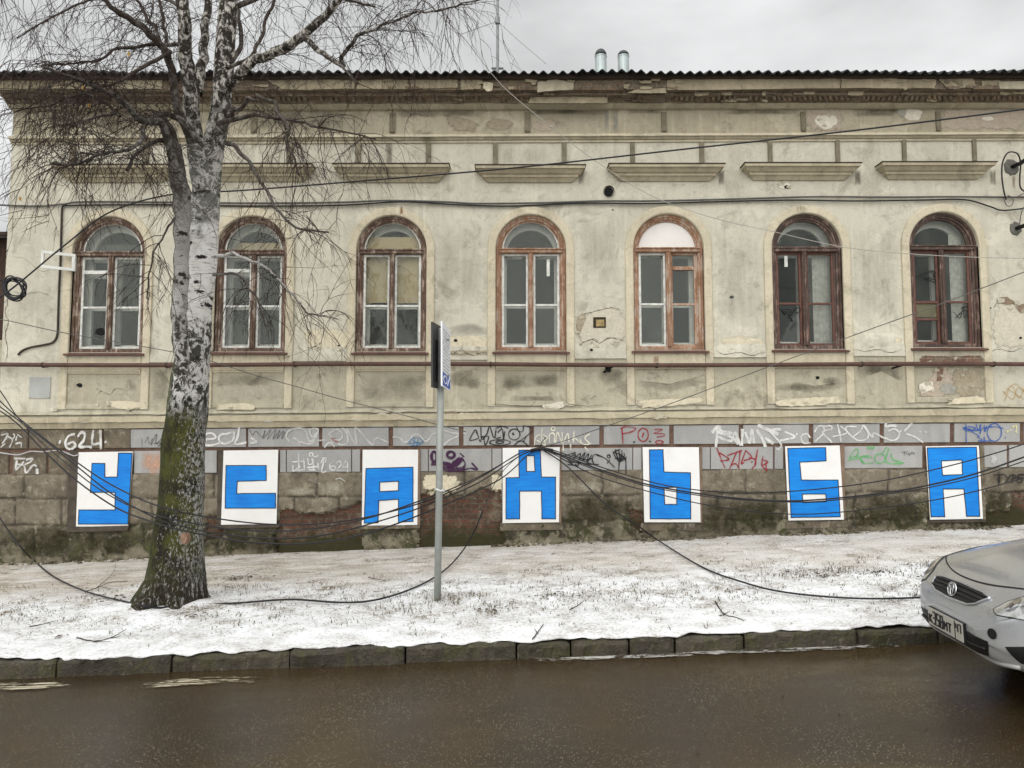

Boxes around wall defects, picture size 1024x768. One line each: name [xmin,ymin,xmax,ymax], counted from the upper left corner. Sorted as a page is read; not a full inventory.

peeling [805,109,844,131]
crack [576,307,625,346]
spalling [991,297,1024,350]
spalling [917,366,986,405]
spalling [273,501,364,553]
spalling [417,474,507,548]